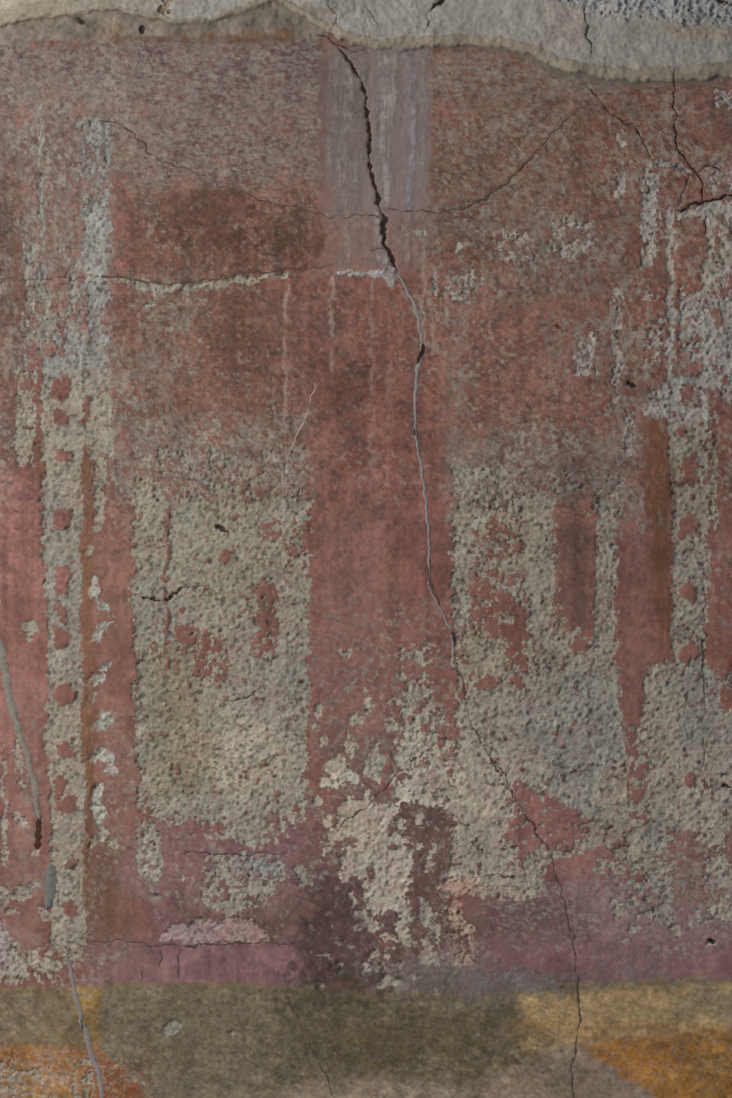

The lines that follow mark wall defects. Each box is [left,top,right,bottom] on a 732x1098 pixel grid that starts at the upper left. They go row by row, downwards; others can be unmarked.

crack [0,265,329,285]
crack [583,0,592,53]
crack [587,74,732,235]
peeling [0,103,292,986]
crack [93,0,582,1098]
spalling [129,159,732,989]
crack [0,639,58,909]
crack [65,948,105,1098]